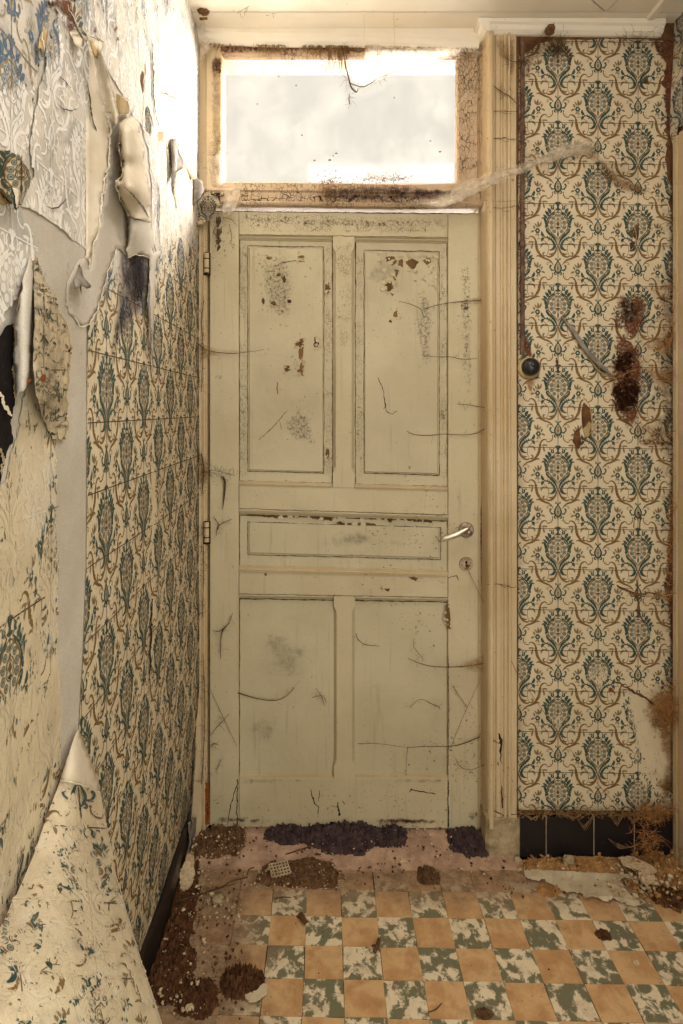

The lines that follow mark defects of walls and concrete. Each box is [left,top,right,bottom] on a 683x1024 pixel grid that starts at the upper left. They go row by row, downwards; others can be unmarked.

water stain [212,45,435,77]
crack [457,65,516,179]
water stain [119,255,146,328]
peeling [377,252,439,323]
peeling [283,336,322,377]
flaking render [0,323,17,483]
peeling [247,514,434,528]